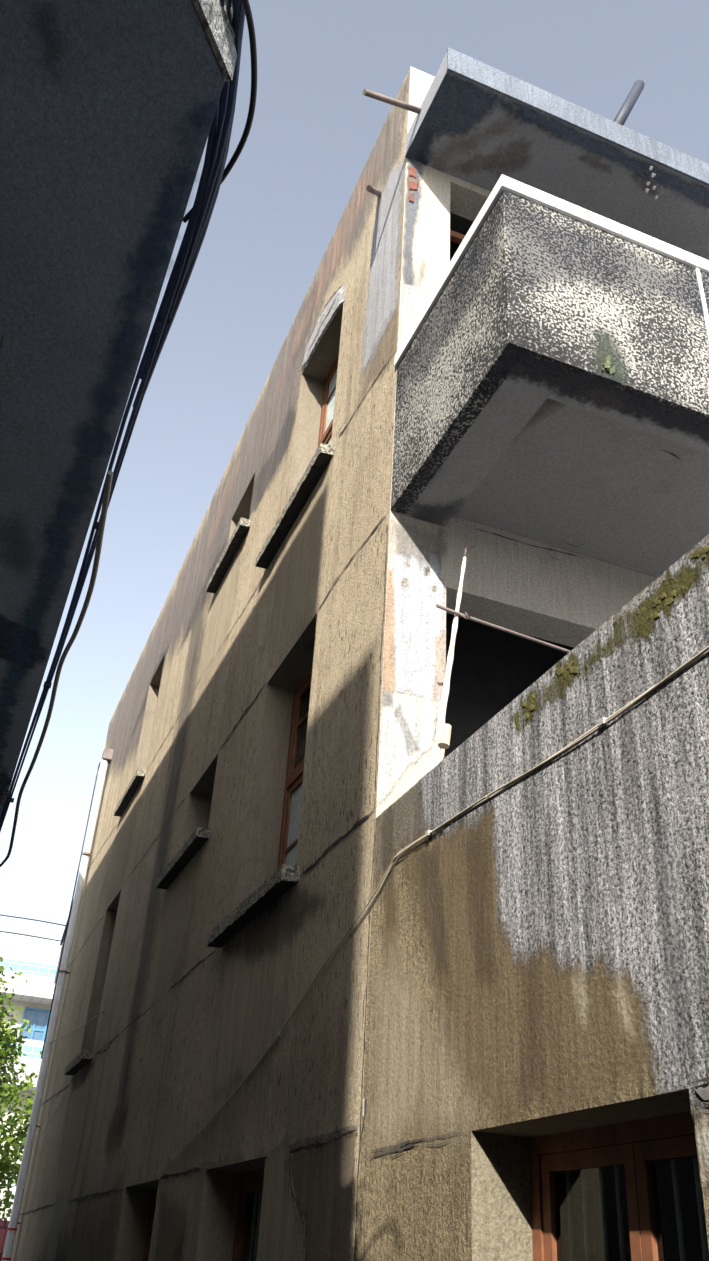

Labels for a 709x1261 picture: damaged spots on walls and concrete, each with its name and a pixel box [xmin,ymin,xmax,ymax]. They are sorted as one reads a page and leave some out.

water stain [0,173,192,803]
water stain [106,73,709,1154]